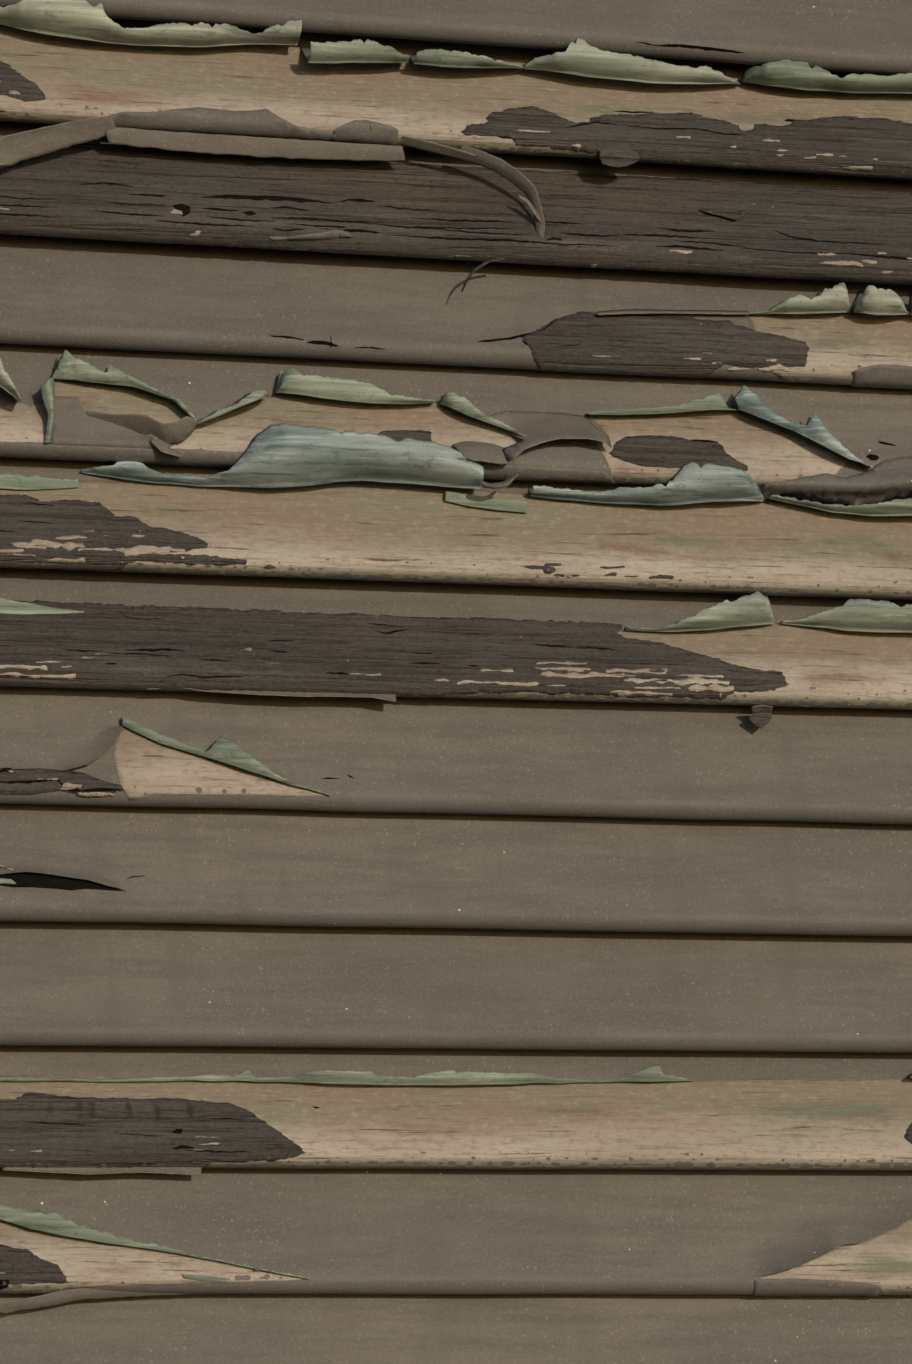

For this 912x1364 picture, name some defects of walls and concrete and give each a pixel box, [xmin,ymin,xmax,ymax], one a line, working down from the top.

peeling [0,0,912,729]
peeling [0,716,331,800]
peeling [0,860,128,907]
peeling [0,1064,912,1176]
peeling [0,1204,310,1314]
peeling [648,1196,912,1296]